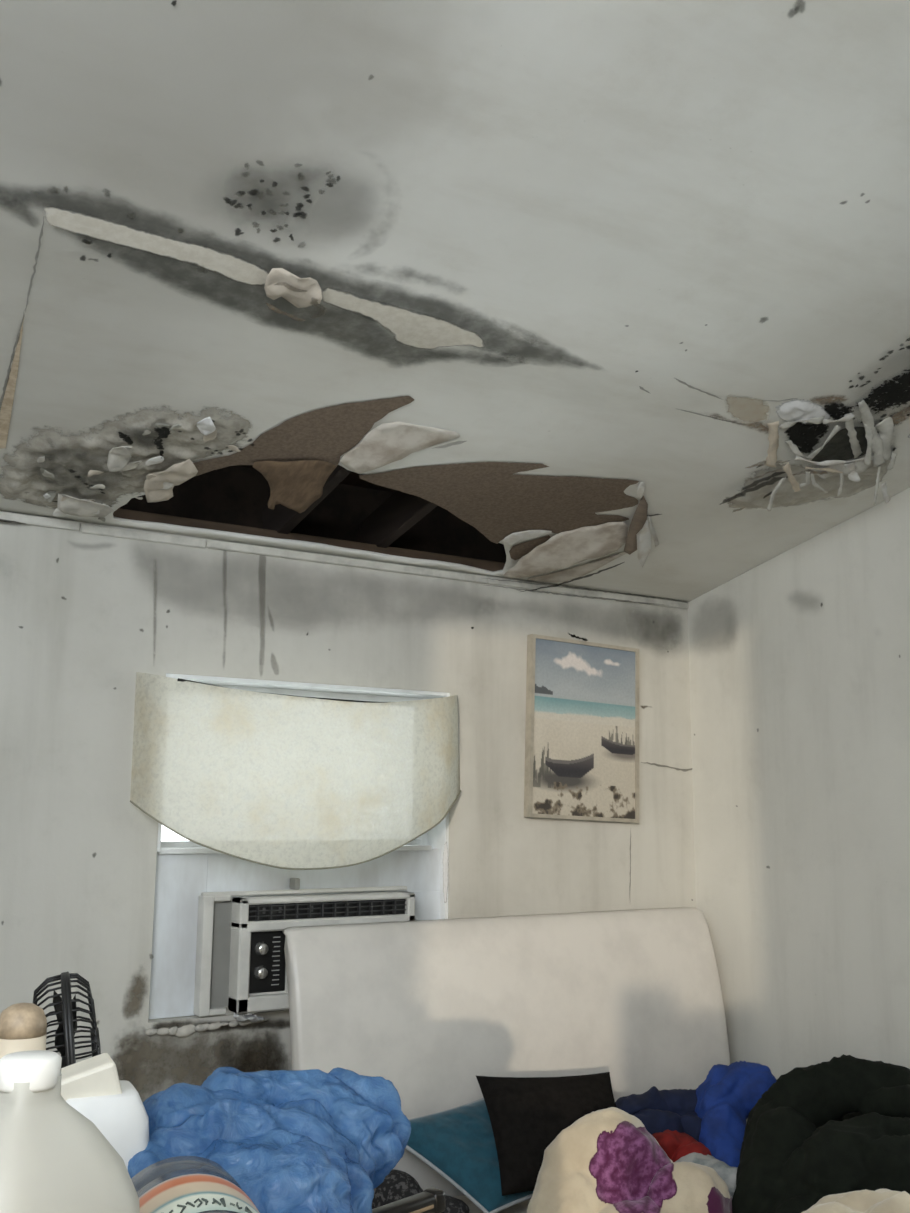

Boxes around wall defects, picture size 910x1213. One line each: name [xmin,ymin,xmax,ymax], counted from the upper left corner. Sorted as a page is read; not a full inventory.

damp [0,161,581,365]
damp [133,429,155,447]
peeling [197,417,216,436]
mould [114,1032,282,1103]